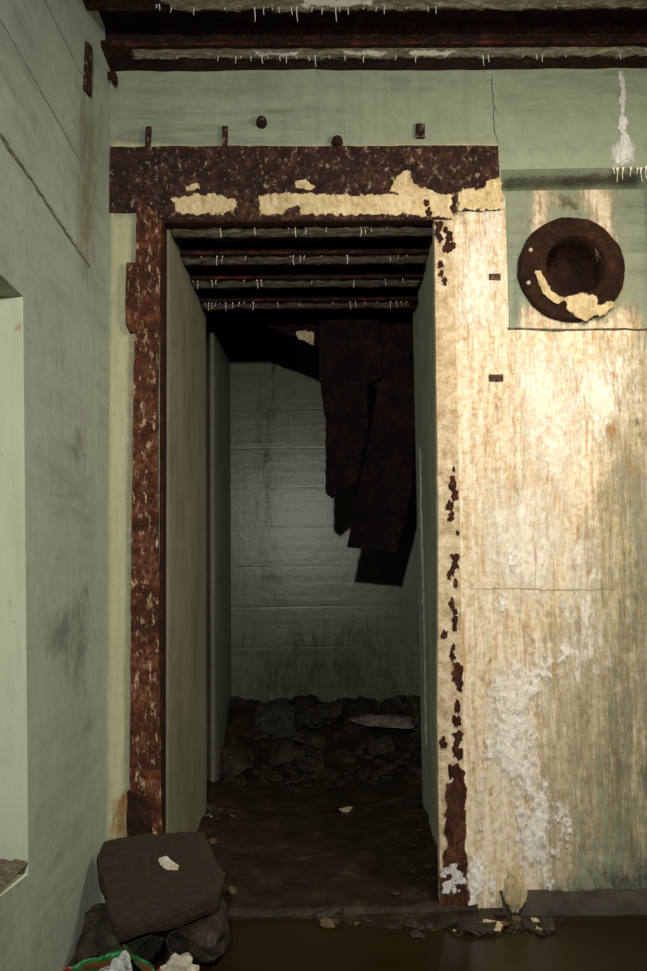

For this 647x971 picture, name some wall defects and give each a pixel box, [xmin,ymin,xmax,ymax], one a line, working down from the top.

crack [0,133,91,267]
peeling [171,183,236,216]
peeling [258,170,504,220]
leakage [503,174,644,238]
corrosion [423,199,456,286]
corrosion [445,466,460,536]
leakage [440,200,647,908]
corrosion [439,553,471,907]
corrosion [112,793,127,836]